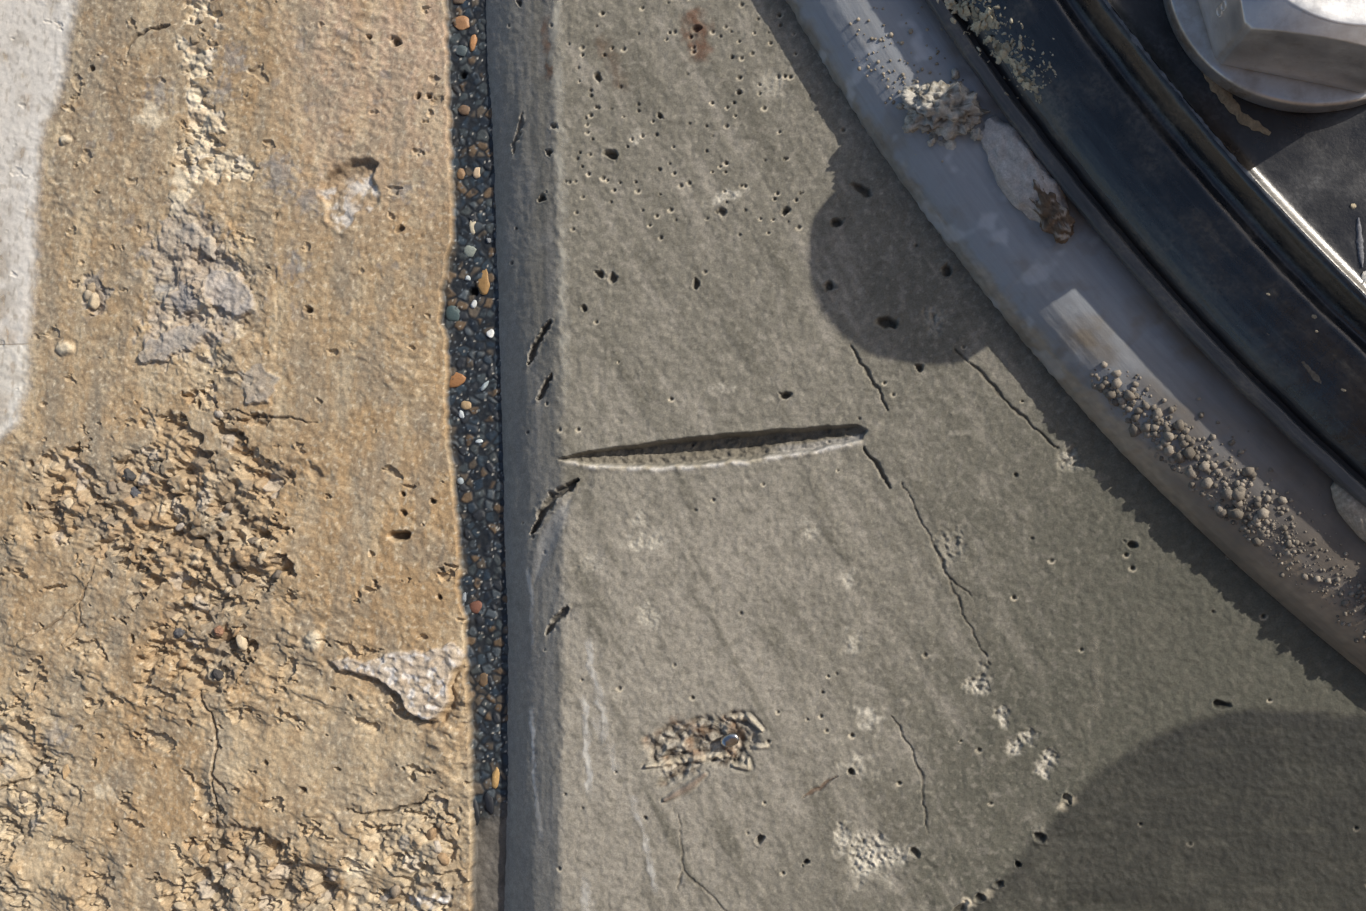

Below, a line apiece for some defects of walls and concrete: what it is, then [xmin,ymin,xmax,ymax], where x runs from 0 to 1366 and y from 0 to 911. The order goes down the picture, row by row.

spalling [17,0,311,698]
crack [10,557,98,650]
crack [197,689,228,810]
spalling [637,705,770,803]
damp [1153,710,1366,826]